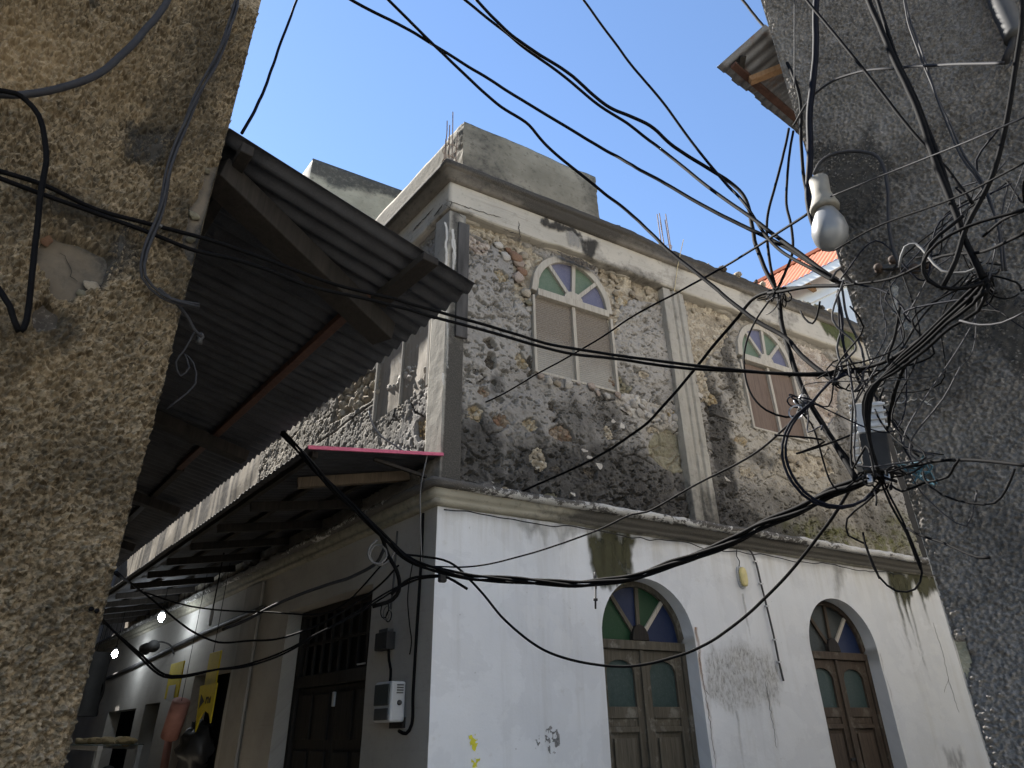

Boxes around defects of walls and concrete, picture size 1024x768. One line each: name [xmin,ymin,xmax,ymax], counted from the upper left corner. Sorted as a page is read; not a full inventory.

spalling [37,235,107,302]
spalling [469,225,543,303]
leakage [541,217,598,258]
spalling [557,251,660,338]
spalling [606,376,683,473]
leakage [588,530,635,589]
leakage [887,572,937,618]
peeling [537,726,560,754]